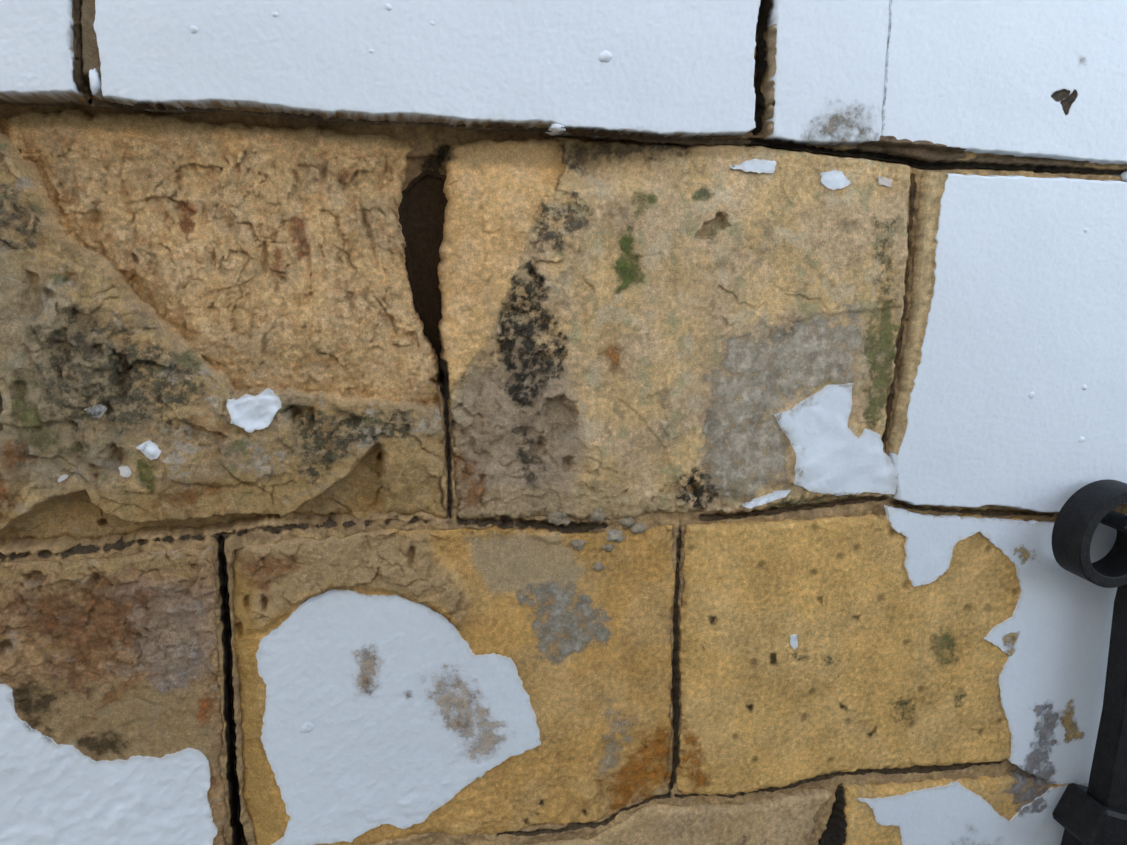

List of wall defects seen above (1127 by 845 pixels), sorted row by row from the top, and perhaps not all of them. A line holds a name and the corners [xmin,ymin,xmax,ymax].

spalling [0,109,565,433]
crack [73,0,1127,452]
spalling [695,212,730,240]
peeling [729,159,776,174]
spalling [763,24,777,136]
peeling [0,684,218,845]
spalling [0,440,388,544]
crack [0,358,608,845]
peeling [256,589,541,845]
crack [496,497,1054,845]
peeling [742,169,1117,845]
water stain [1061,700,1083,742]